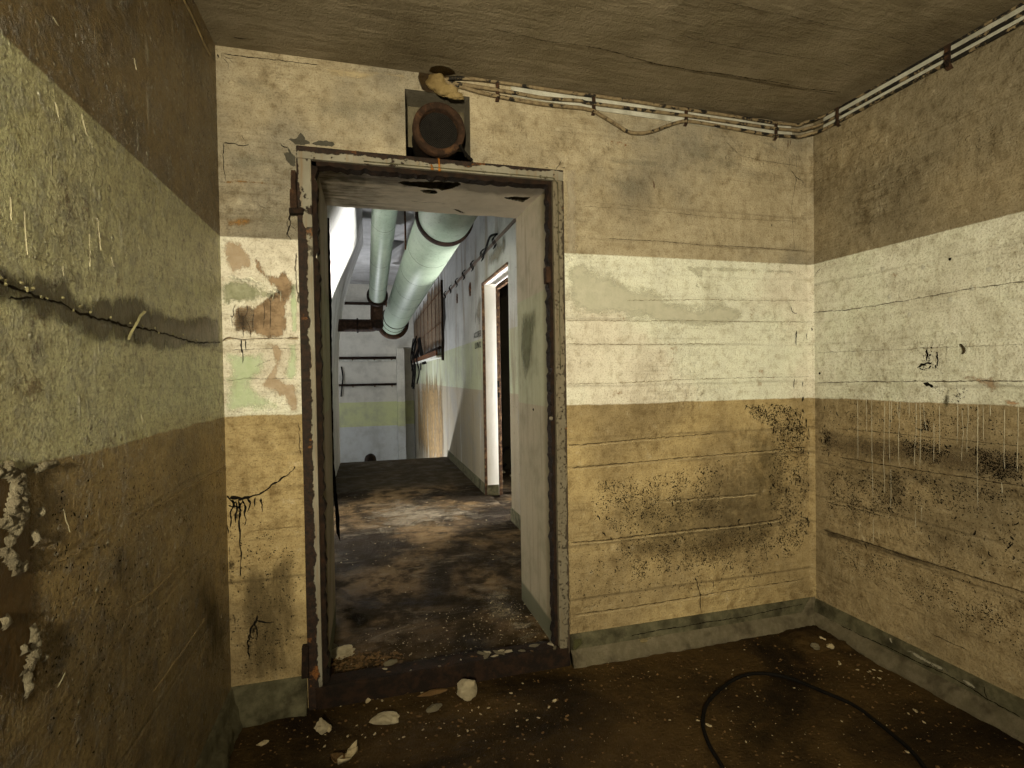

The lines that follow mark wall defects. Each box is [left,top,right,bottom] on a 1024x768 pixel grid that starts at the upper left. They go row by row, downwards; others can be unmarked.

water stain [0,268,281,364]
crack [0,278,294,381]
peeling [226,242,299,410]
crack [227,466,295,576]
water stain [574,379,810,607]
water stain [821,347,1024,653]
crack [247,615,272,658]